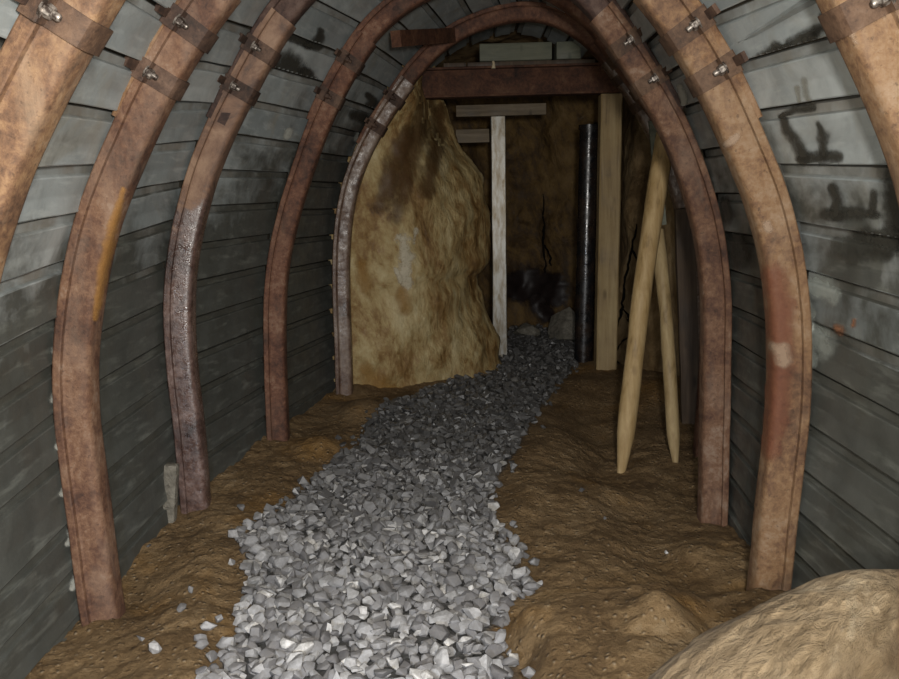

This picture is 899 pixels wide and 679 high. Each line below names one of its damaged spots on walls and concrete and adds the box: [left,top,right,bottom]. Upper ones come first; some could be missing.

leakage [778,104,843,165]
rust [94,188,125,320]
leakage [820,166,899,264]